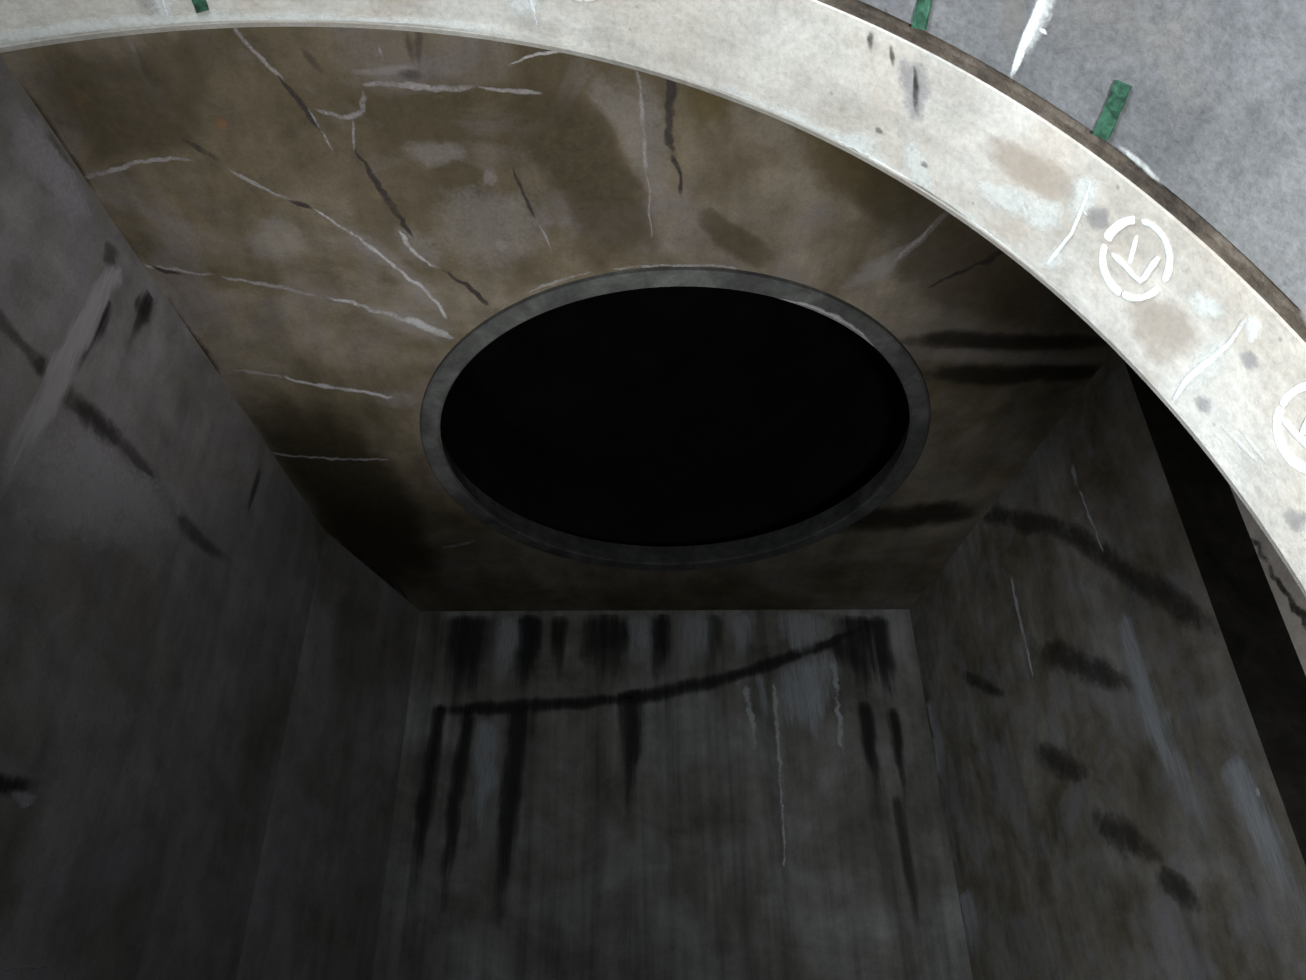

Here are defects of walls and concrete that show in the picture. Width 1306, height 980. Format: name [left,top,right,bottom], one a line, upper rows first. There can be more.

crack [1012,0,1050,73]
crack [234,30,488,338]
crack [640,79,682,202]
crack [1044,180,1094,268]
leakage [4,266,180,539]
crack [246,371,390,399]
leakage [850,503,970,529]
crack [1253,540,1306,626]
leakage [448,616,567,689]
leakage [619,691,641,795]
leakage [743,616,894,865]
leakage [416,705,527,888]